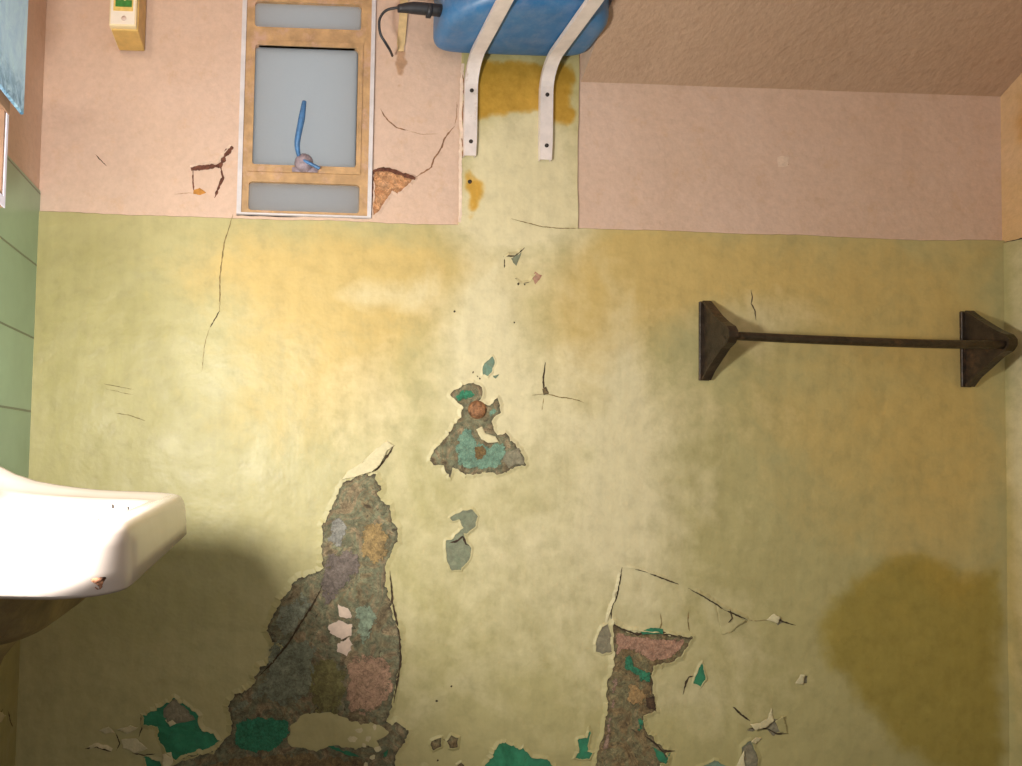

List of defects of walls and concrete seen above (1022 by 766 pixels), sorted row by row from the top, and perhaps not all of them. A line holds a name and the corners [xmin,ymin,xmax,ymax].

crack [180,144,234,198]
crack [202,216,233,369]
peeling [426,354,529,482]
crack [537,363,584,408]
peeling [443,506,480,573]
spalling [140,441,413,766]
spalling [572,565,794,766]
peeling [418,732,466,766]
peeling [481,739,561,766]